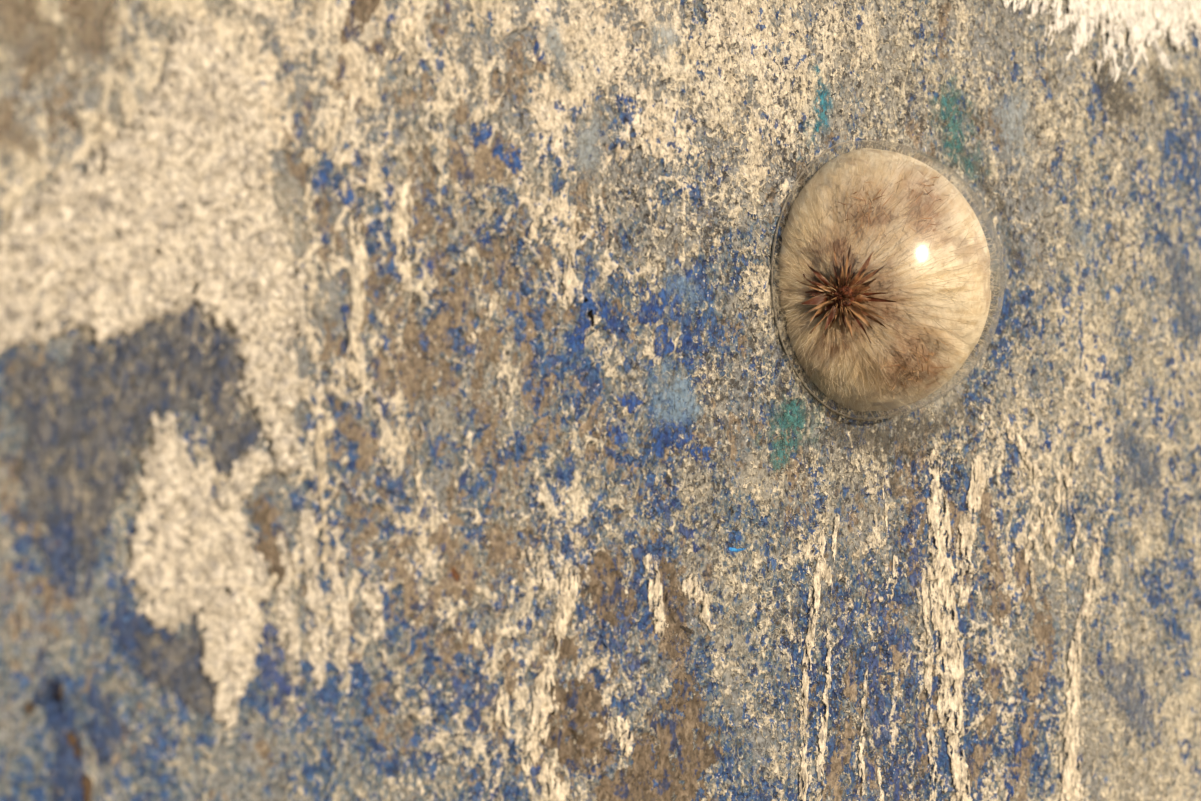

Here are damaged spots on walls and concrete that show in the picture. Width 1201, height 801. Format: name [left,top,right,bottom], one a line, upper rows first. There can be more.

spalling [491,34,551,113]
water stain [992,0,1172,125]
water stain [1179,22,1201,52]
spalling [494,218,552,297]
spalling [574,198,596,267]
flaking render [0,0,524,731]
spalling [481,545,724,801]
spalling [823,652,858,801]
spalling [889,638,908,727]
spalling [967,485,1056,801]